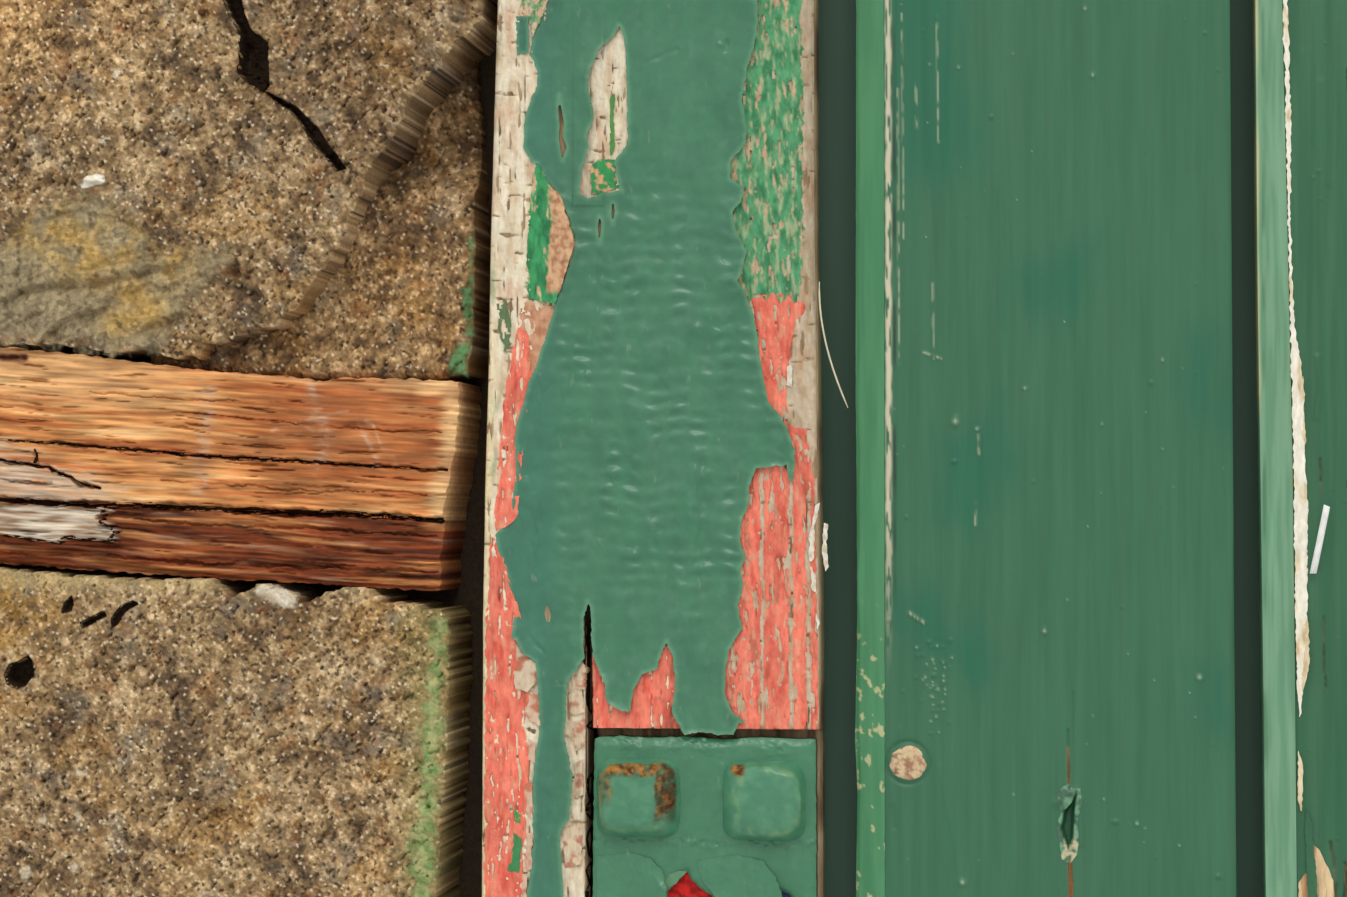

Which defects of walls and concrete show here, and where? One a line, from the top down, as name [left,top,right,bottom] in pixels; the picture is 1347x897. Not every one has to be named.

crack [223,0,346,171]
peeling [580,27,628,198]
crack [0,438,448,545]
spalling [0,0,575,897]
peeling [725,0,829,730]
peeling [1282,0,1330,717]
rust [605,763,676,815]
peeling [1297,751,1335,897]